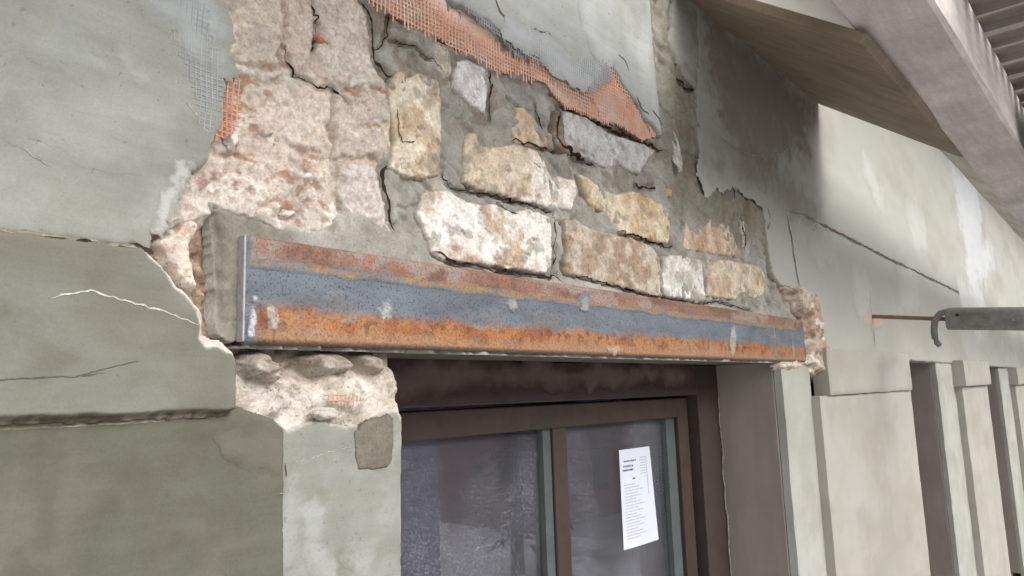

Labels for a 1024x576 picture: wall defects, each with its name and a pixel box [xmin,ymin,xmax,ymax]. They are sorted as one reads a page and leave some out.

spalling [672,131,683,173]
crack [0,227,154,254]
spalling [150,0,401,429]
crack [785,210,959,293]
crack [5,361,137,380]
crack [49,289,202,326]
rust [244,235,806,362]
spalling [770,286,829,383]